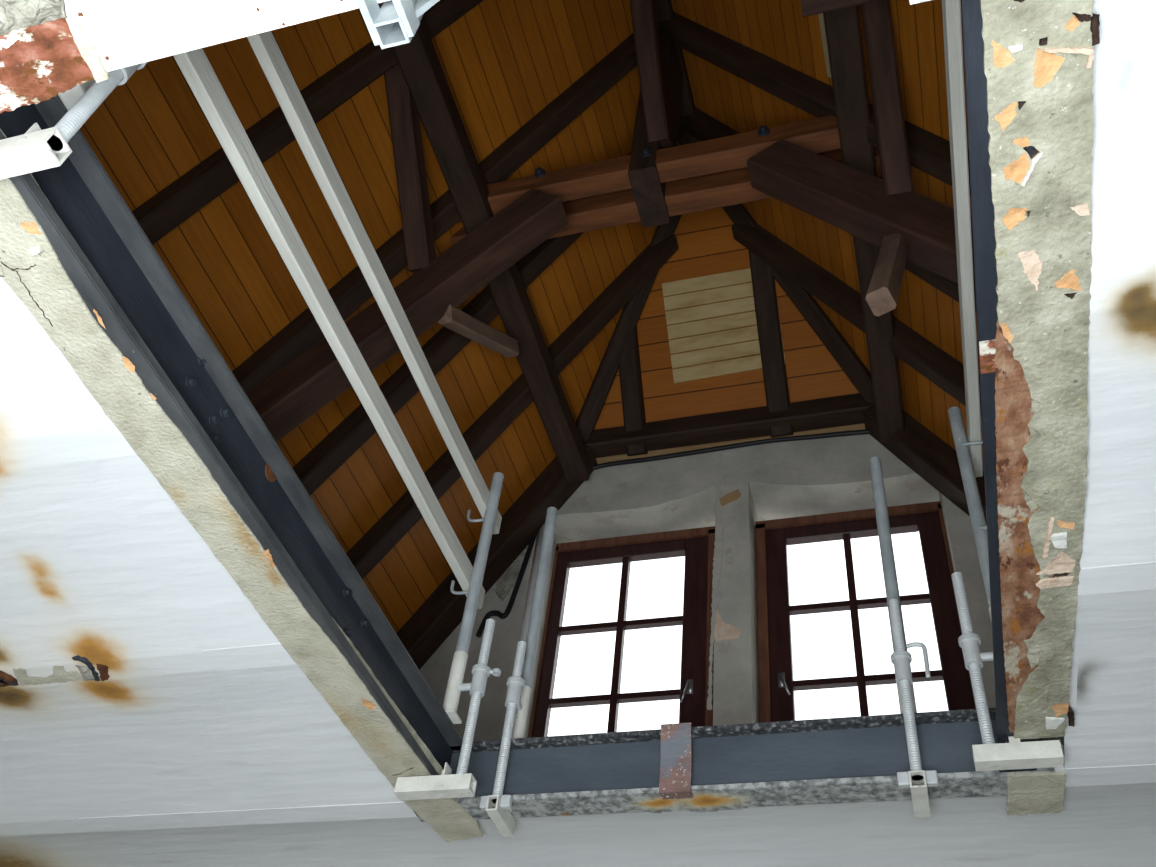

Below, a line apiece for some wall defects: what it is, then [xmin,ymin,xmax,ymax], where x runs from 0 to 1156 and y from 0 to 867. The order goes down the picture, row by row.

spalling [0,0,66,35]
spalling [991,13,1100,88]
spalling [995,101,1043,187]
spalling [1002,208,1030,230]
spalling [1070,203,1090,216]
crack [0,258,53,327]
spalling [1018,249,1043,291]
spalling [1054,269,1082,299]
rust [994,319,1054,733]
rust [0,513,231,749]
flaking render [13,666,83,686]